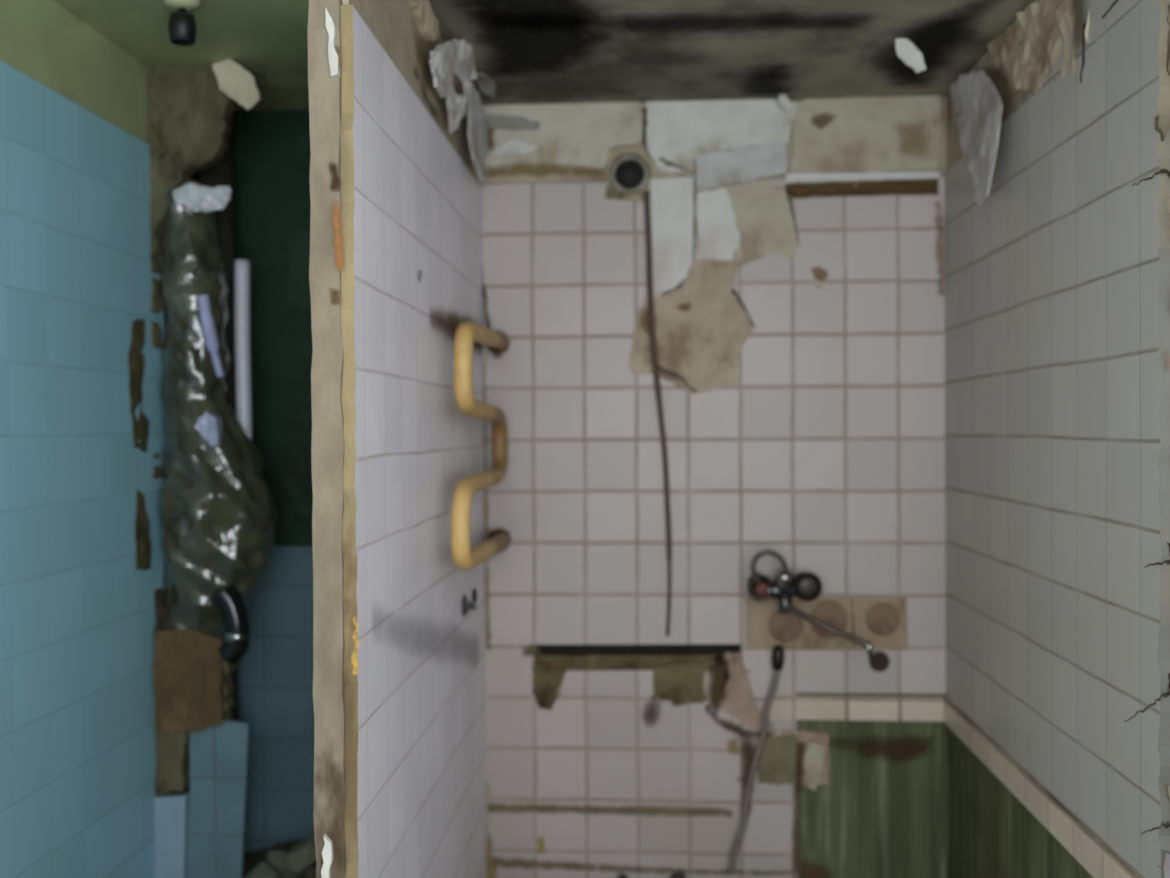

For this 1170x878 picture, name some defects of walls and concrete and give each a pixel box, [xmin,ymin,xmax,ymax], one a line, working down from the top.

peeling [895,38,926,73]
spalling [987,0,1089,94]
crack [1132,169,1170,186]
spalling [473,72,942,394]
spalling [128,60,260,479]
spalling [135,490,152,571]
crack [1145,542,1170,567]
spalling [153,588,171,658]
spalling [154,659,236,795]
spalling [532,660,567,711]
crack [1124,673,1170,722]